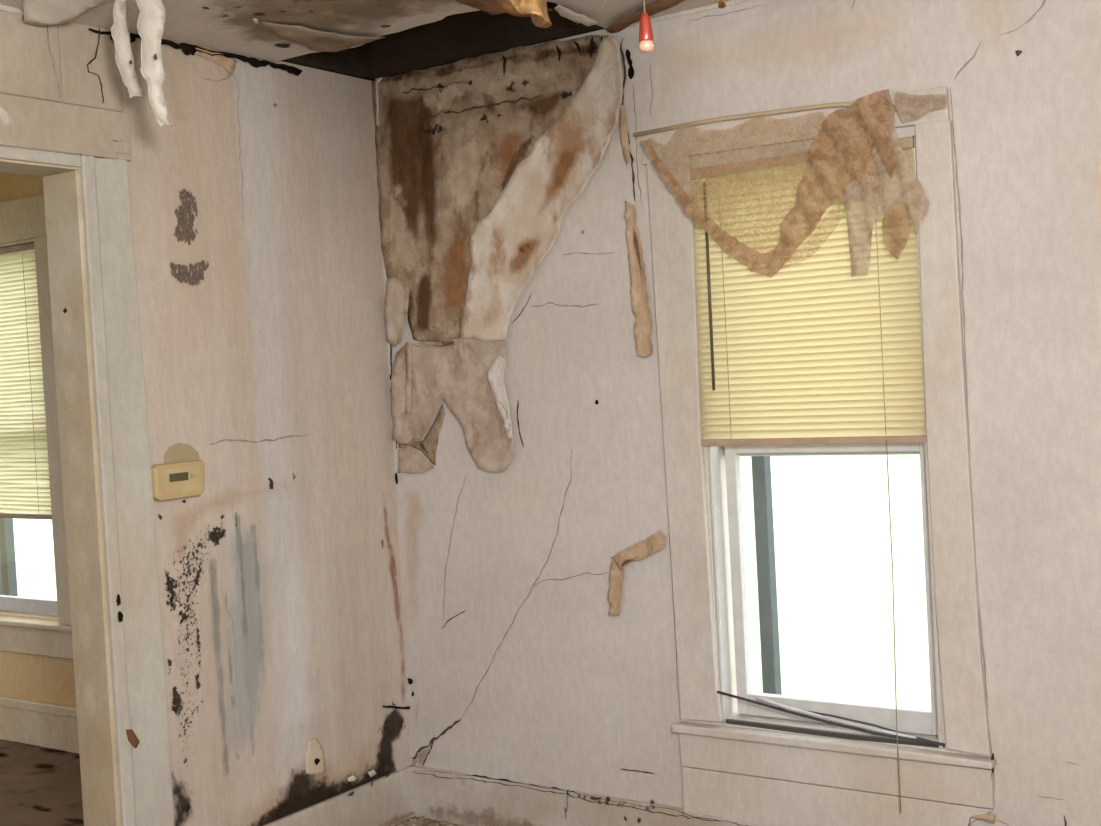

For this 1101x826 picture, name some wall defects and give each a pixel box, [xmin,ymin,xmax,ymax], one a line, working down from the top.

peeling [111,0,173,127]
peeling [253,18,385,52]
water stain [220,0,428,31]
flaking render [371,0,686,414]
peeling [486,355,513,440]
mould [164,514,237,744]
crack [412,450,765,826]
peeling [608,530,666,616]
mould [173,782,191,826]
water stain [252,703,405,826]